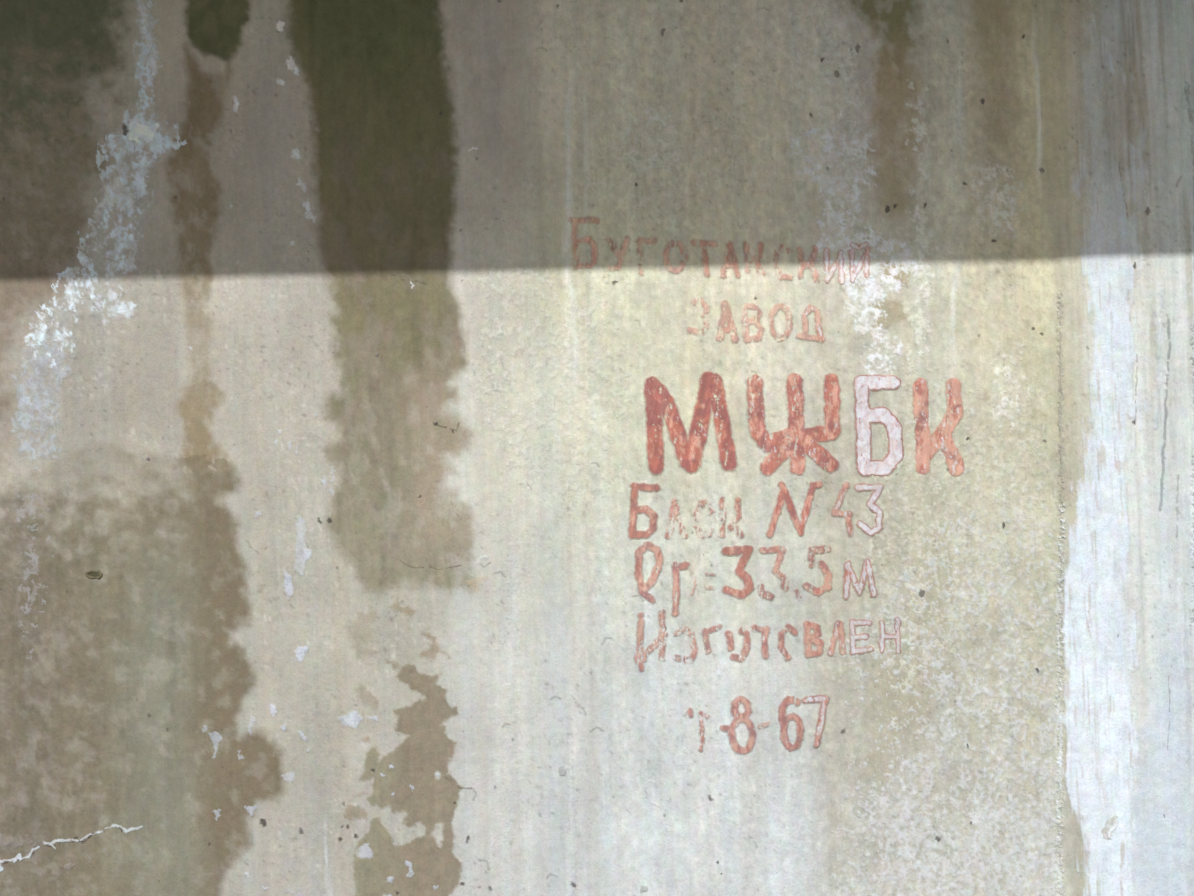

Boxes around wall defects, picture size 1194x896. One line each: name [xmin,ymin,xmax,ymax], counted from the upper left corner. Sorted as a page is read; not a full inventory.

crack [0,824,143,894]
damp [0,0,293,896]
damp [273,0,1194,896]